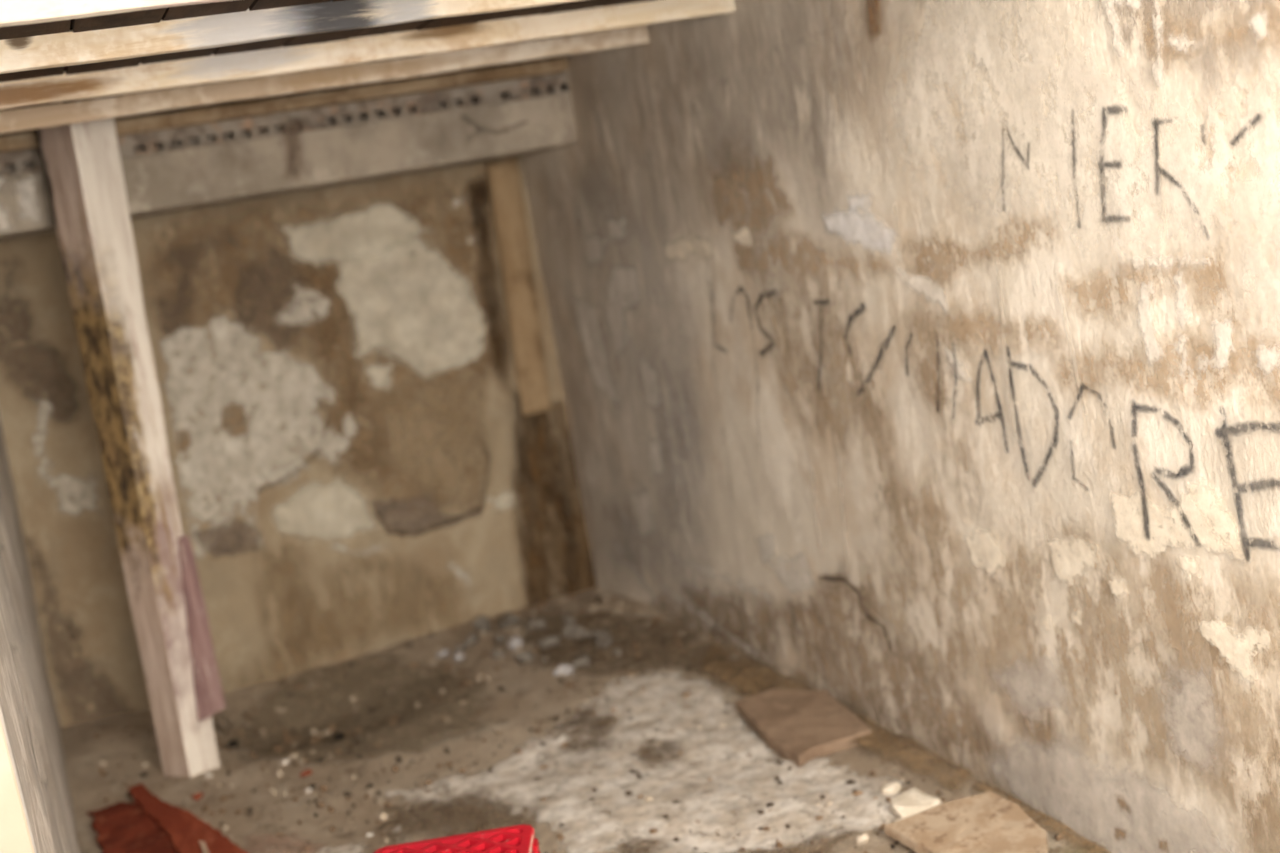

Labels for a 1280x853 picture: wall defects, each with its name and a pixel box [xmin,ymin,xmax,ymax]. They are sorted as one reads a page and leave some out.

peeling [275,204,486,389]
peeling [162,315,381,558]
peeling [653,579,1224,853]
peeling [965,528,1005,574]
damp [868,550,1232,785]
peeling [1049,537,1097,585]
peeling [1109,575,1128,596]
peeling [1200,621,1270,681]